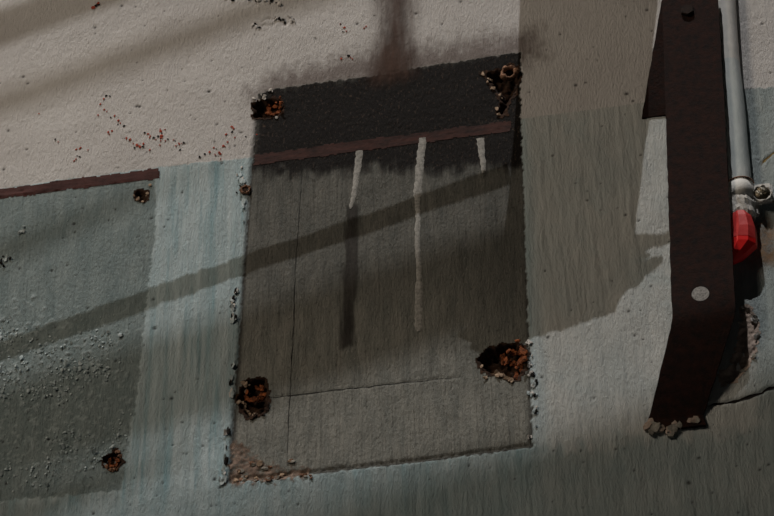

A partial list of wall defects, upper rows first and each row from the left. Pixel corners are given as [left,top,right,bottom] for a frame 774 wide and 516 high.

rust [373,0,411,81]
leakage [340,205,357,349]
peeling [229,362,270,420]
peeling [491,339,538,413]
peeling [219,427,313,486]